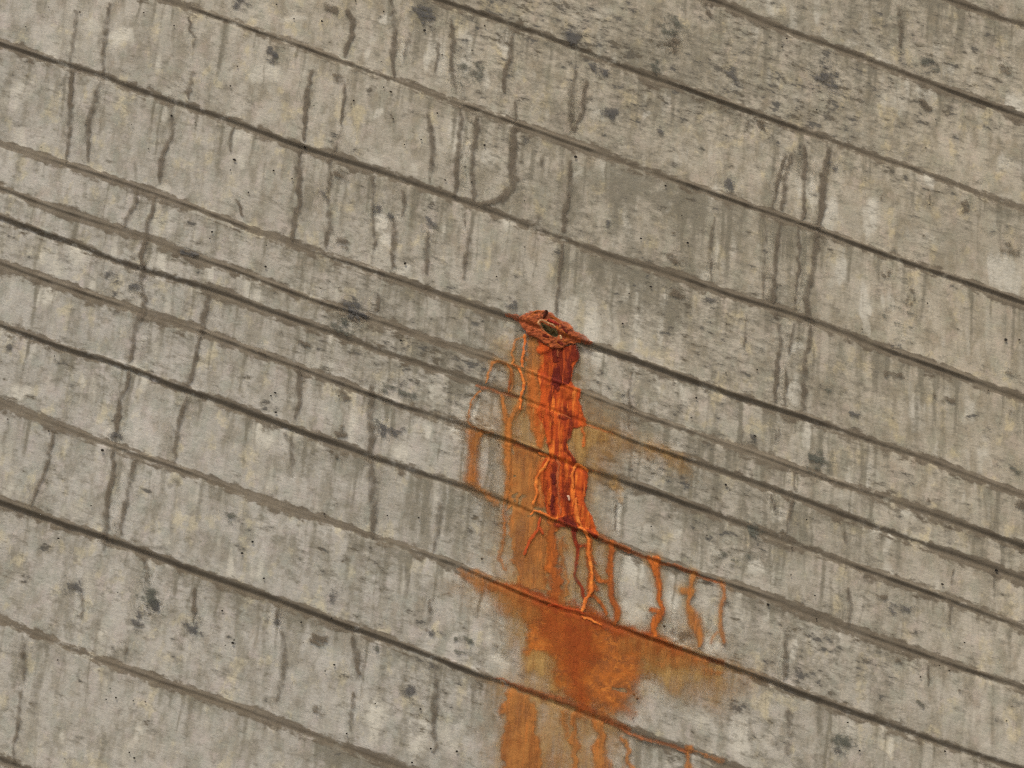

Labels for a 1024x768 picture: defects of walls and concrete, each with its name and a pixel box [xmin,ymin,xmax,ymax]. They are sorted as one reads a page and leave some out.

water stain [324,2,356,57]
water stain [390,0,410,77]
water stain [434,22,485,91]
water stain [290,69,349,249]
water stain [426,114,435,180]
water stain [453,32,518,204]
water stain [372,176,406,267]
water stain [423,216,437,274]
spalling [505,310,593,349]
water stain [762,223,794,403]
water stain [772,145,838,409]
corrosion [464,334,726,768]